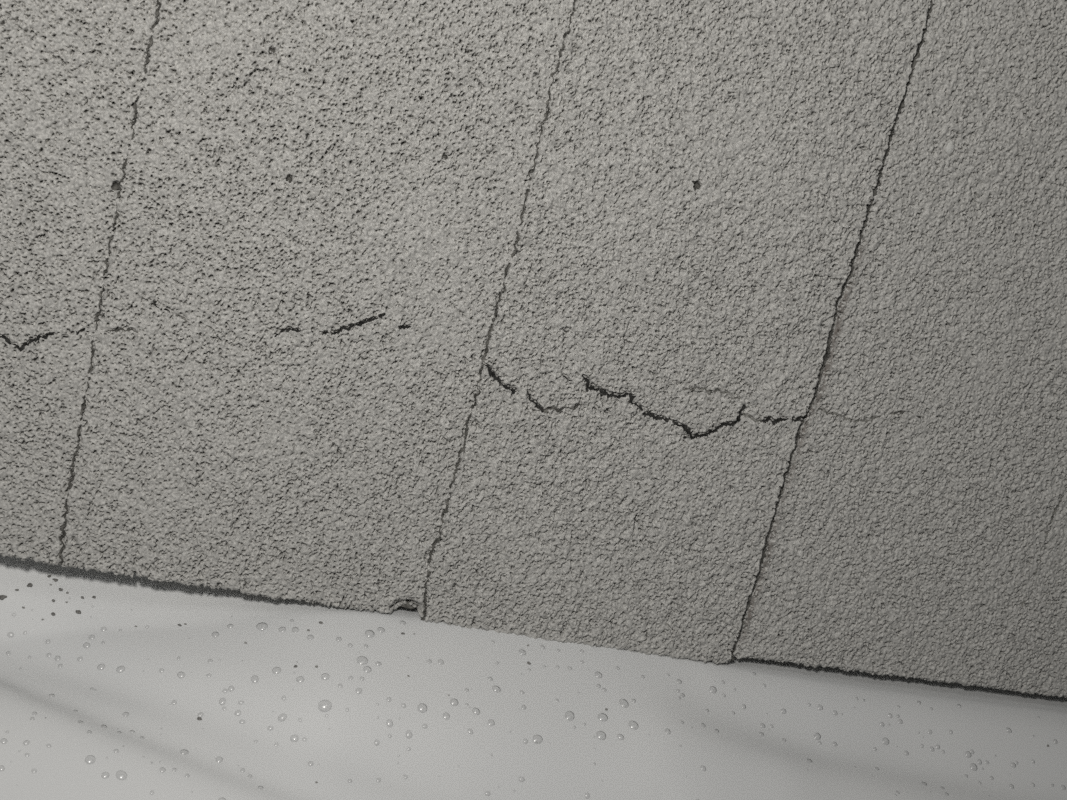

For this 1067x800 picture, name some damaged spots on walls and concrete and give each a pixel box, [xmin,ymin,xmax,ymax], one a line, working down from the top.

crack [0,0,161,565]
crack [275,313,411,337]
crack [421,0,933,661]